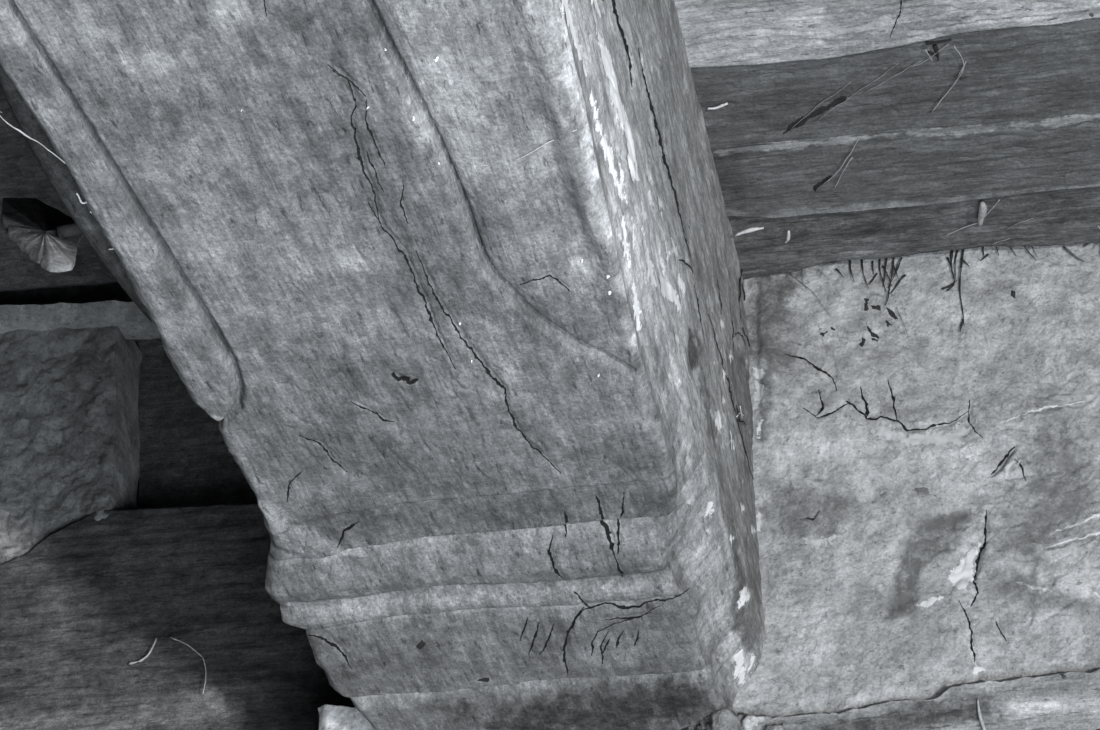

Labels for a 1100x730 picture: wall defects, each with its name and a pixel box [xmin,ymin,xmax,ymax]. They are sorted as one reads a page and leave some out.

crack [328,64,561,473]
crack [520,275,570,292]
crack [612,0,754,480]
crack [785,354,983,438]
crack [991,446,1026,481]
crack [595,492,625,577]
crack [520,511,690,674]
crack [959,510,1007,662]
spalling [699,707,749,730]